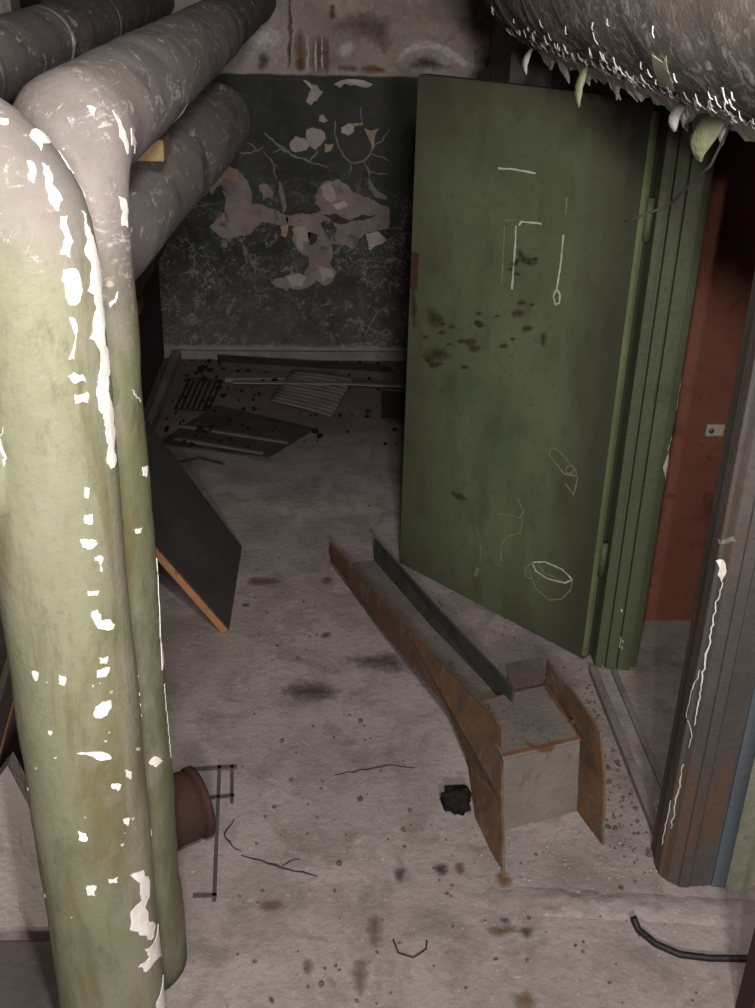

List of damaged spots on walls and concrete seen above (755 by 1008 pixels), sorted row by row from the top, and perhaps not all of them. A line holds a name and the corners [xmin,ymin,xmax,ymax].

peeling [303,80,323,105]
peeling [334,79,373,91]
peeling [290,114,334,153]
crack [238,121,390,178]
peeling [341,123,379,151]
peeling [209,166,390,290]